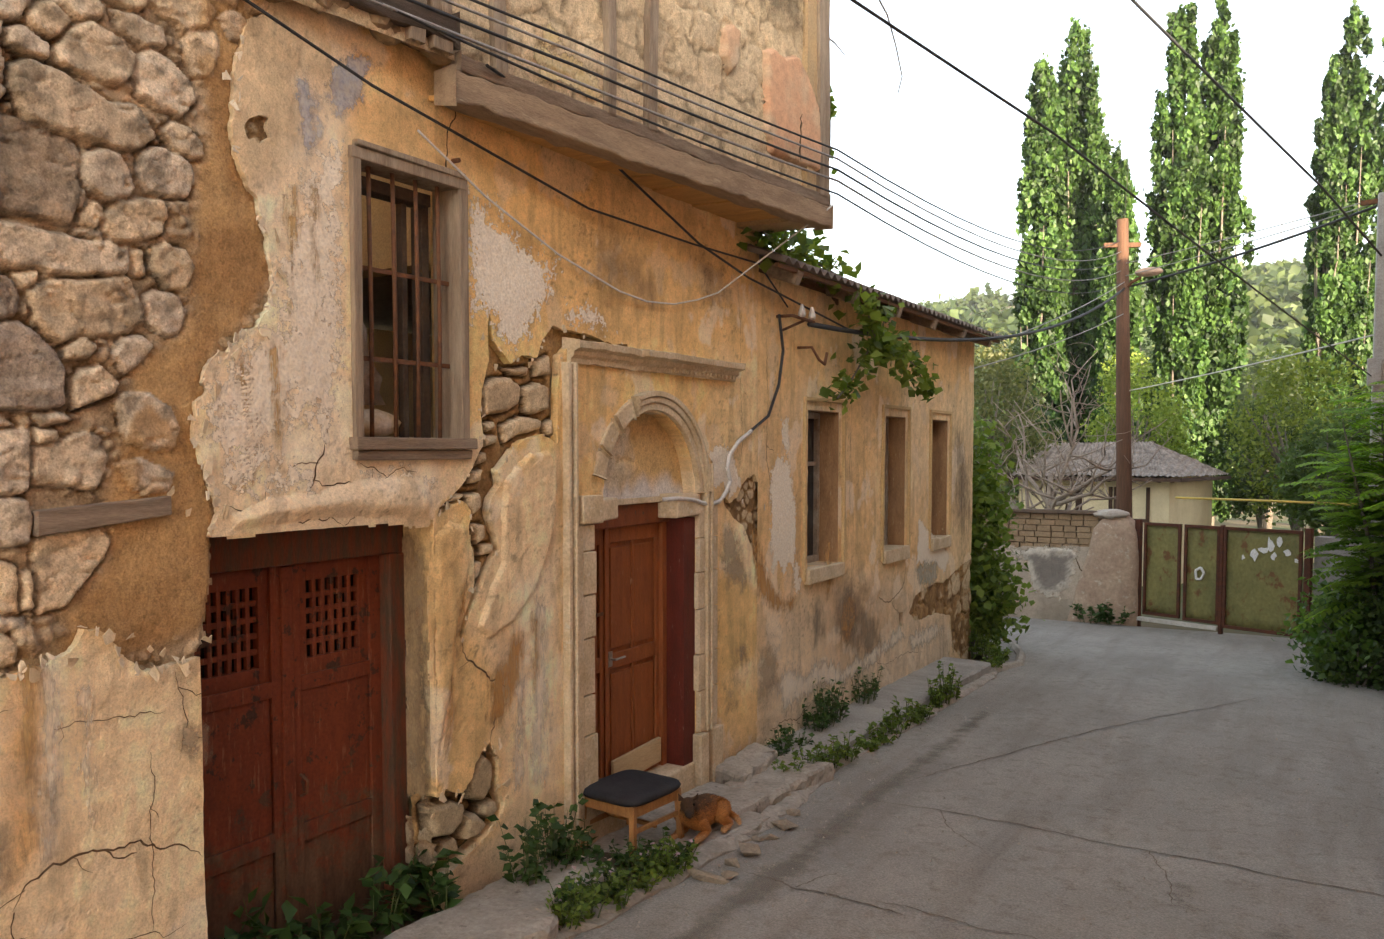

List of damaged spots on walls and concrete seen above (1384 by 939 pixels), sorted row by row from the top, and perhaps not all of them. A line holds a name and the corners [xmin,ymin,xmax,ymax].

spalling [0,0,371,683]
spalling [438,184,623,643]
peeling [709,416,802,593]
spalling [909,519,971,659]
crack [1,673,205,939]
spalling [405,738,511,914]